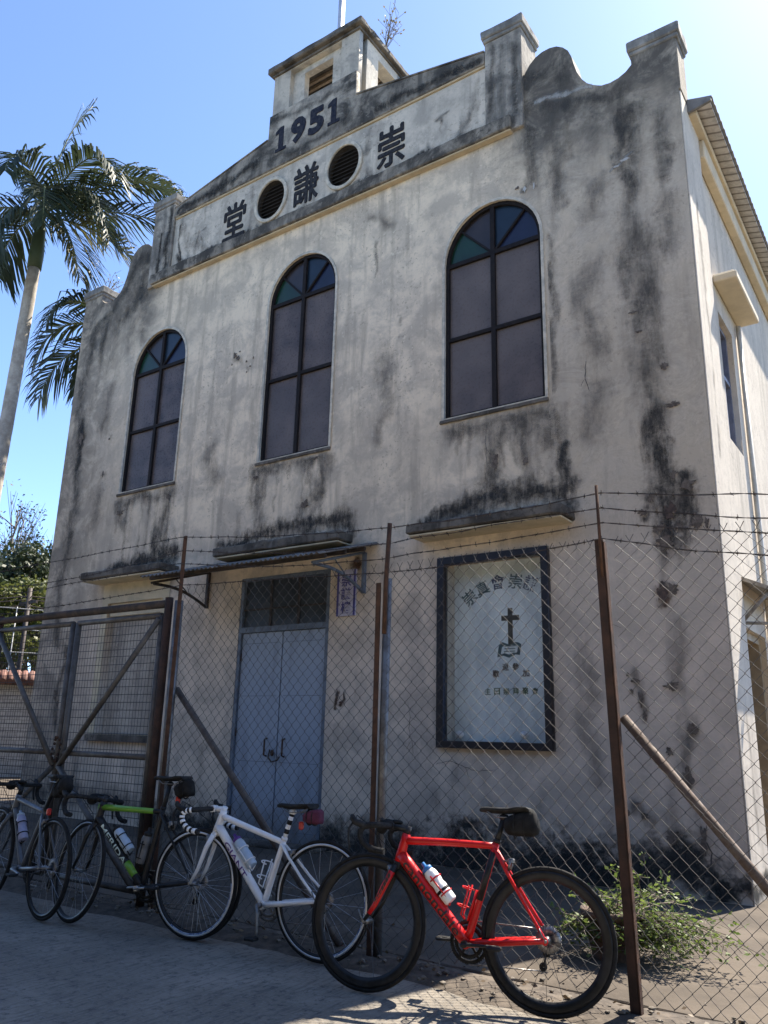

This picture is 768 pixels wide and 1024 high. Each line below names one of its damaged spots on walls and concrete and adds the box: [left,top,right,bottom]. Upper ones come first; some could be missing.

water stain [628,215,655,333]
water stain [640,350,680,424]
water stain [75,420,84,479]
water stain [108,491,181,569]
water stain [216,456,355,548]
water stain [419,411,576,523]
water stain [319,818,768,903]